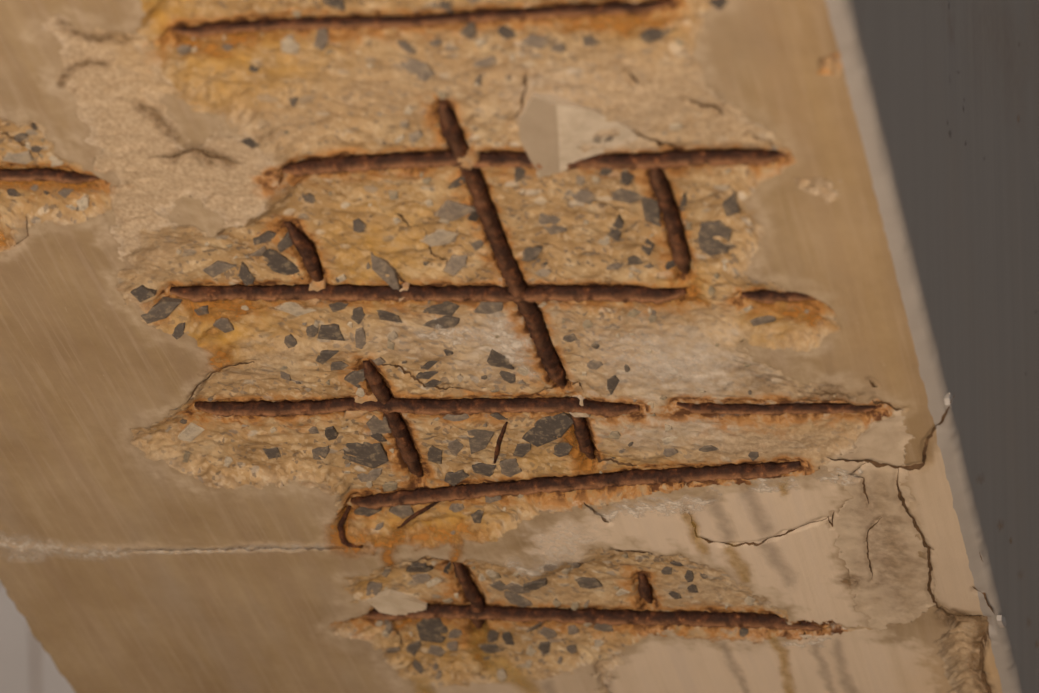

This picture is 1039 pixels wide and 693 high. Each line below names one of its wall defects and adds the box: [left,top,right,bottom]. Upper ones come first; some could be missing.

spalling [0,0,916,548]
rust [564,424,593,472]
peeling [944,392,953,408]
crack [121,545,368,553]
spalling [327,547,872,693]
crack [688,512,834,547]
peeling [823,460,938,631]
crack [827,395,995,693]